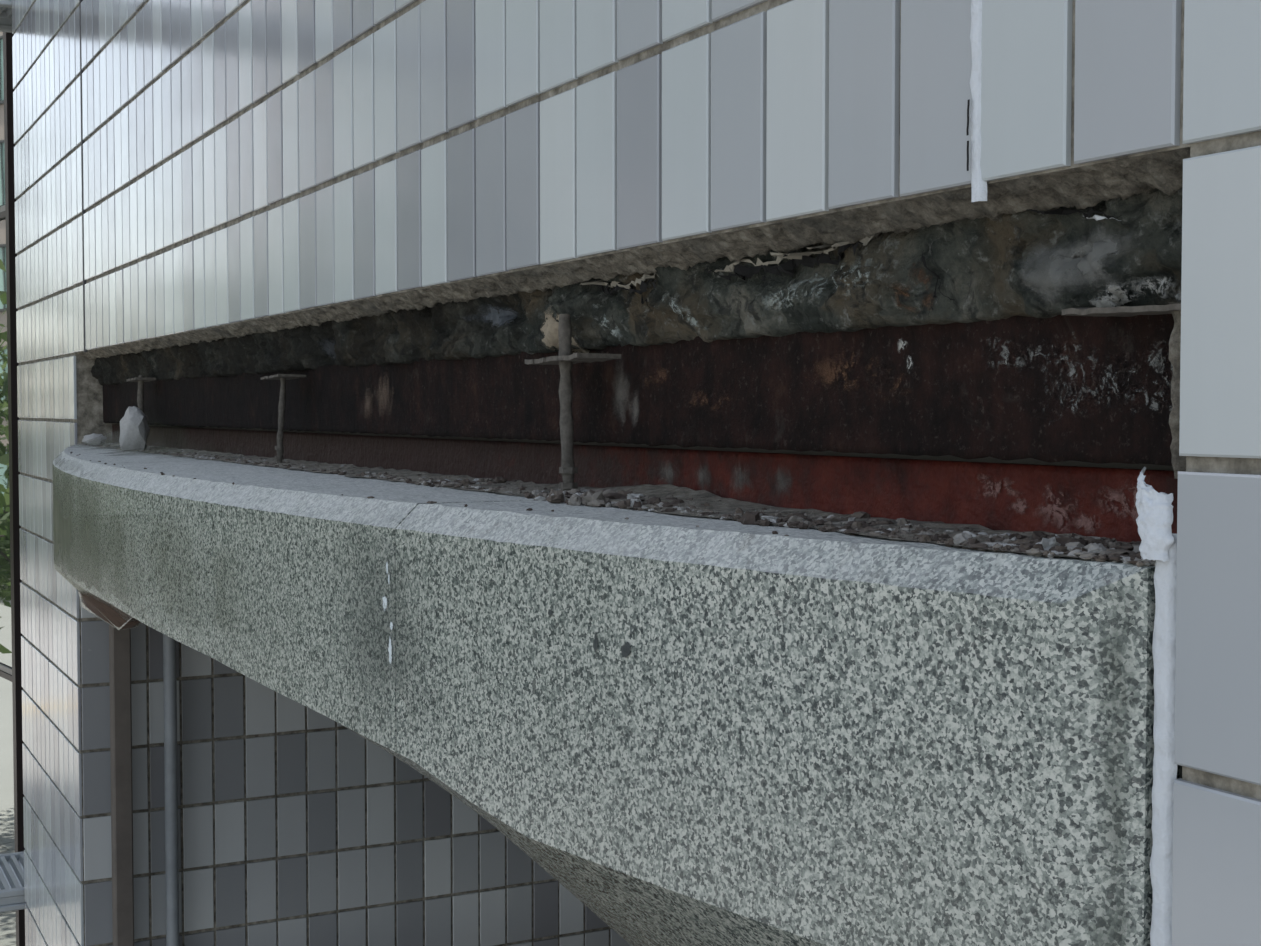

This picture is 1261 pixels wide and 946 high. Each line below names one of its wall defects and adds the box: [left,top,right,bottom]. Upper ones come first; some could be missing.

spalling [1026,234,1118,290]
spalling [473,306,518,327]
spalling [540,312,590,353]
water stain [992,344,1173,416]
peeling [981,477,1095,532]
peeling [1105,487,1139,520]